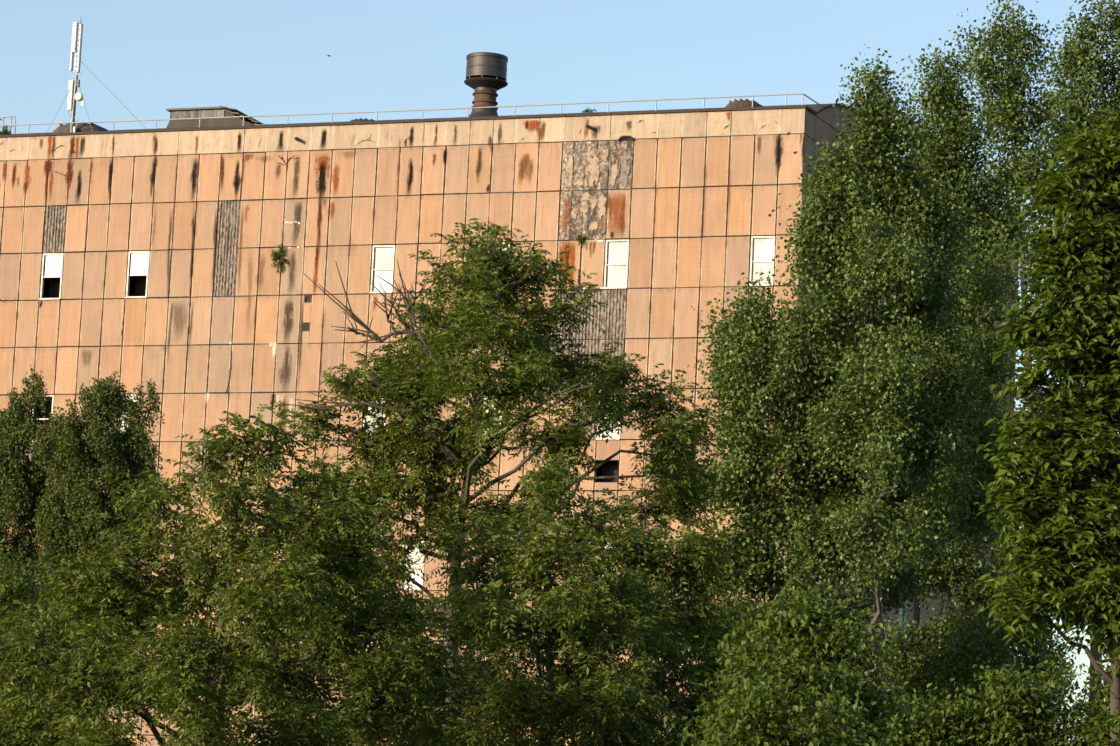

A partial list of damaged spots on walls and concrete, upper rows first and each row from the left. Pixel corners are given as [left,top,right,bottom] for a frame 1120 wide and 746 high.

corrosion [523,121,540,132]
corrosion [3,163,31,191]
corrosion [40,137,79,199]
corrosion [518,156,530,177]
spalling [559,140,634,242]
corrosion [313,157,339,288]
corrosion [609,198,625,237]